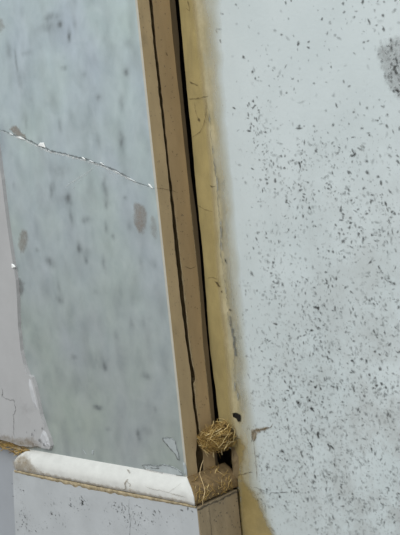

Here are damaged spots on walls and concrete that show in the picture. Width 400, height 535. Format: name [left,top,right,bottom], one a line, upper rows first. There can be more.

crack [10,127,153,188]
peeling [143,437,187,476]